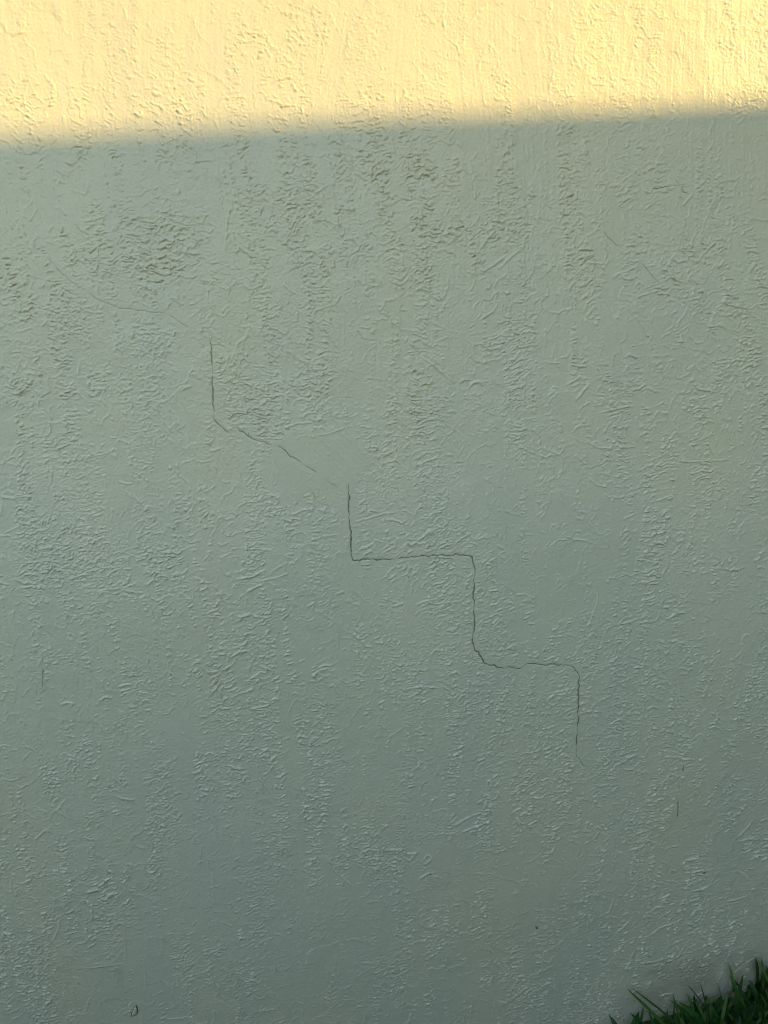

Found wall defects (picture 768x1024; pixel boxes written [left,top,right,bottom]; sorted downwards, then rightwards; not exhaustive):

crack [49,260,588,767]